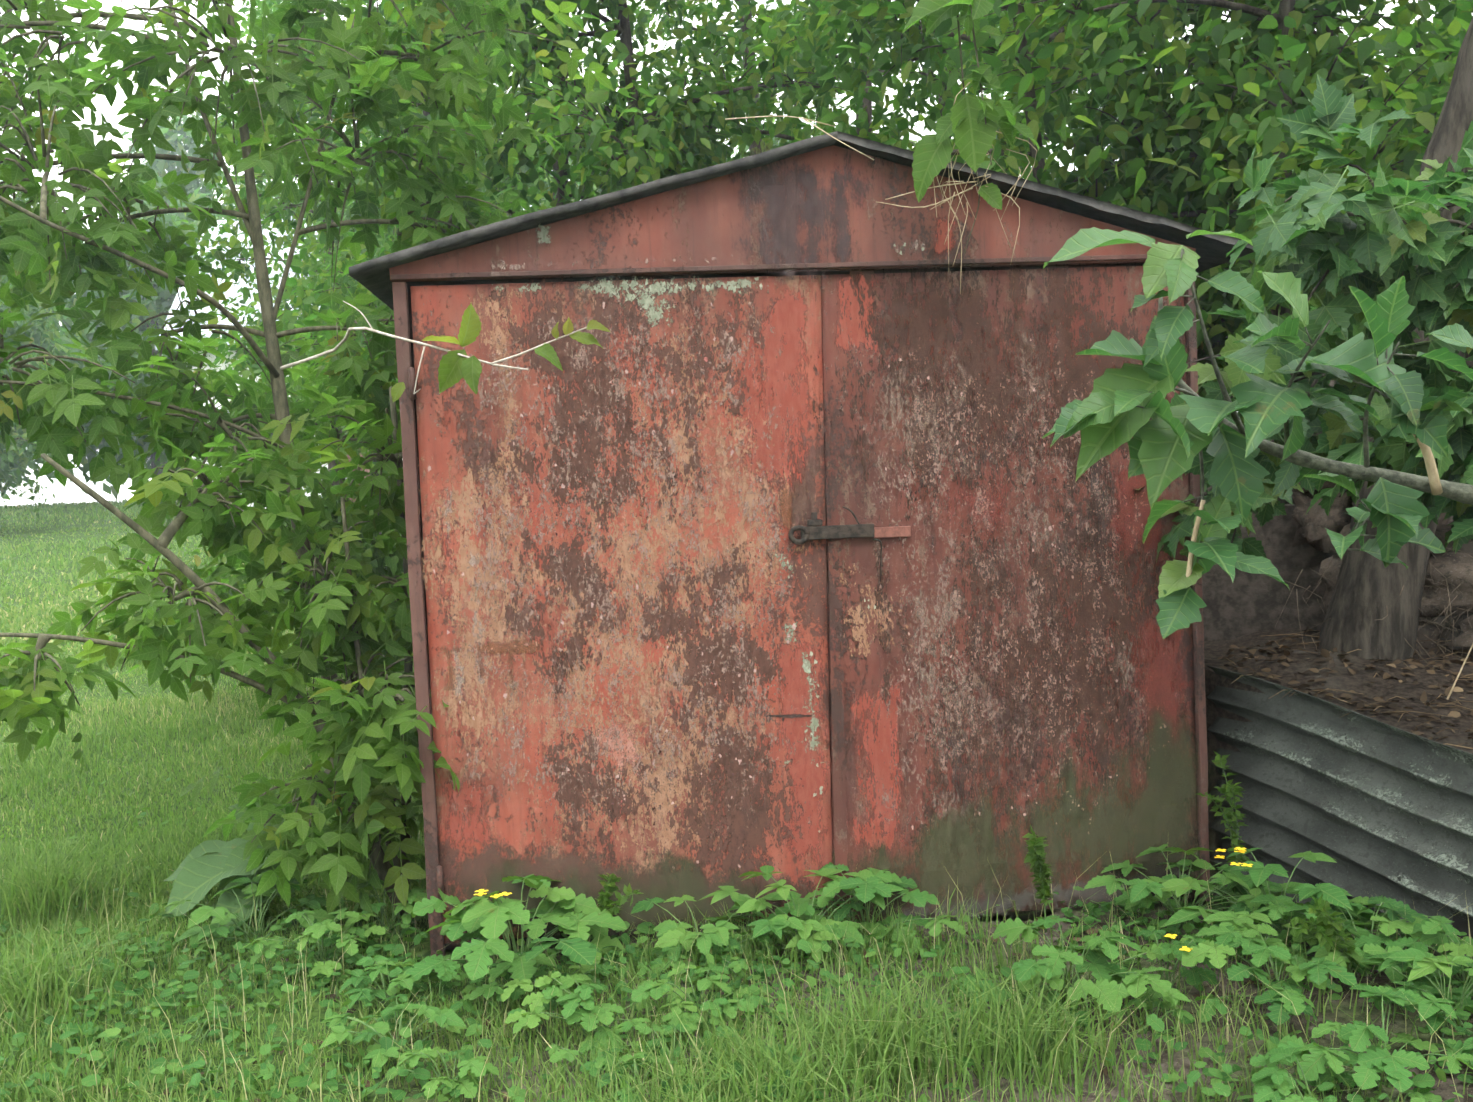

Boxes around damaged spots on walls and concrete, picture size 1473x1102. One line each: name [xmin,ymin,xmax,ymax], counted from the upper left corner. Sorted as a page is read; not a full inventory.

rust [441,273,804,887]
rust [872,544,893,711]
leakage [729,146,1199,855]